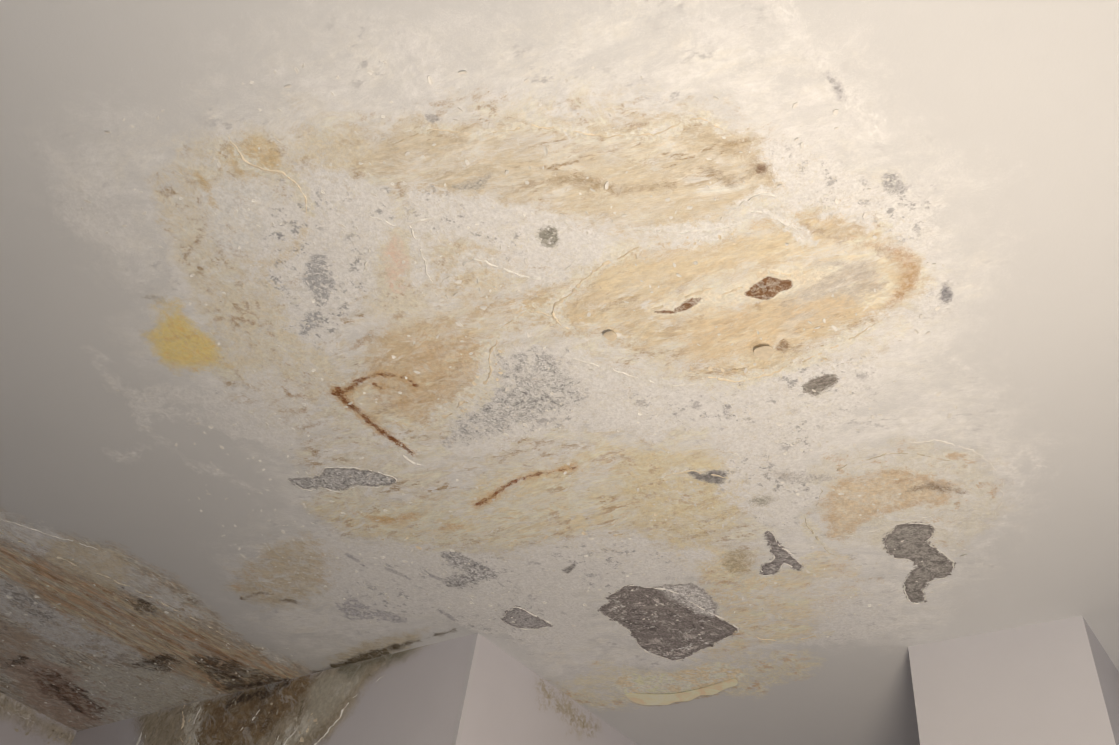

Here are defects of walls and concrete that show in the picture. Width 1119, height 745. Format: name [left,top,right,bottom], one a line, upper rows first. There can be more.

spalling [287,466,398,493]
spalling [423,551,500,590]
spalling [759,530,804,576]
spalling [882,522,957,604]
spalling [500,606,553,630]
spalling [598,583,746,707]